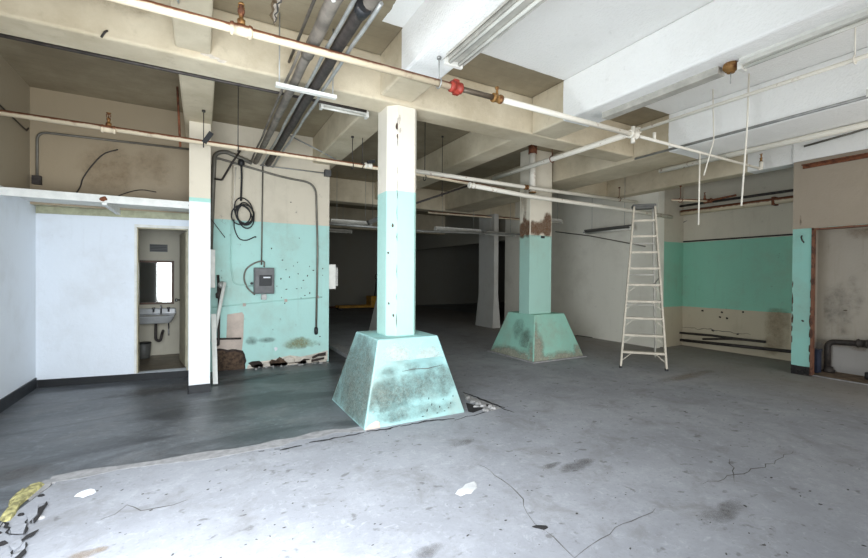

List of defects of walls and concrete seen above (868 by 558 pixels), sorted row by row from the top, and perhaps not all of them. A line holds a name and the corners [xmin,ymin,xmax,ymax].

crack [703,452,793,484]
spalling [0,482,48,558]
crack [480,465,655,556]